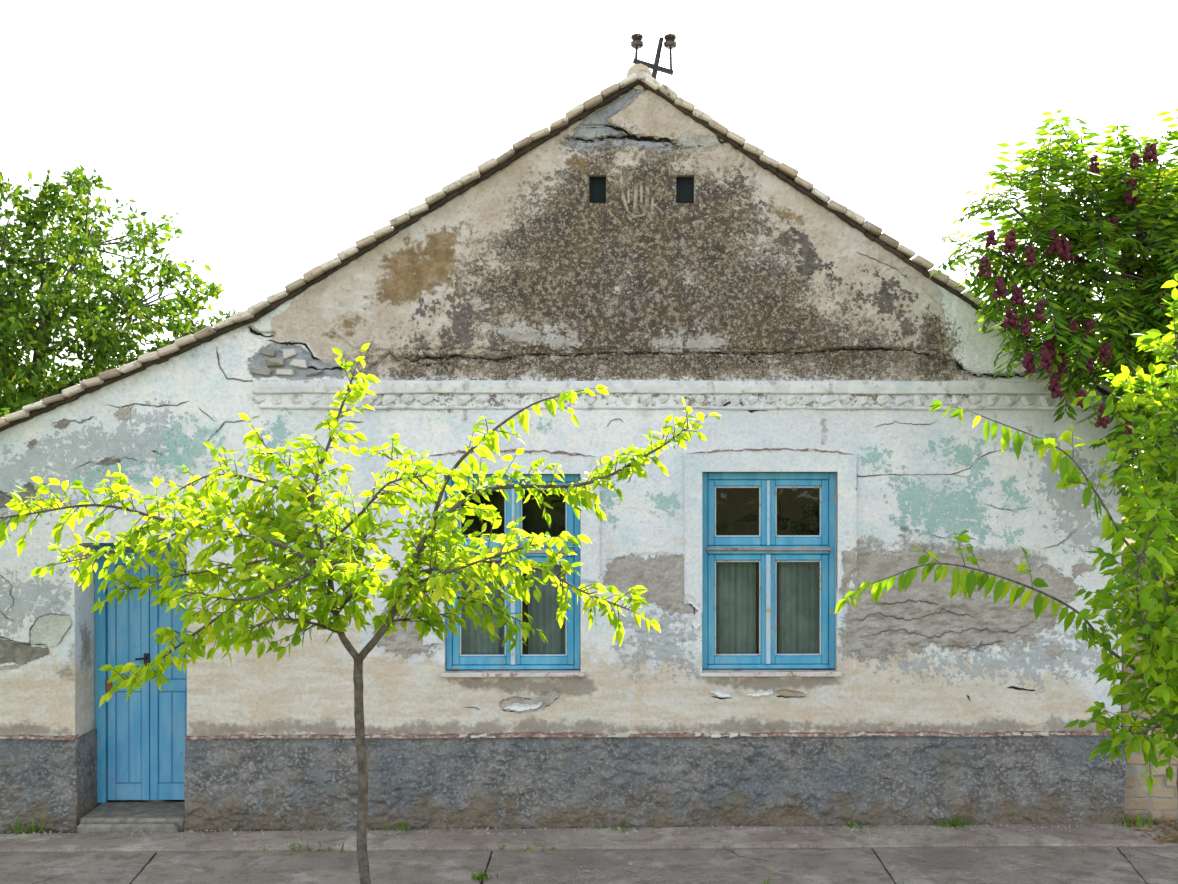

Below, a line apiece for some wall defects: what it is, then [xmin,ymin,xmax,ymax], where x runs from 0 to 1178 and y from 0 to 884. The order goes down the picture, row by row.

crack [565,125,725,148]
water stain [772,213,822,281]
water stain [881,272,918,303]
crack [216,351,253,382]
crack [379,348,1027,378]
crack [110,401,258,441]
peeling [687,426,1121,578]
peeling [841,547,858,598]
peeling [0,566,75,670]
peeling [603,553,702,682]
peeling [841,620,1122,694]
flaking render [500,689,560,714]